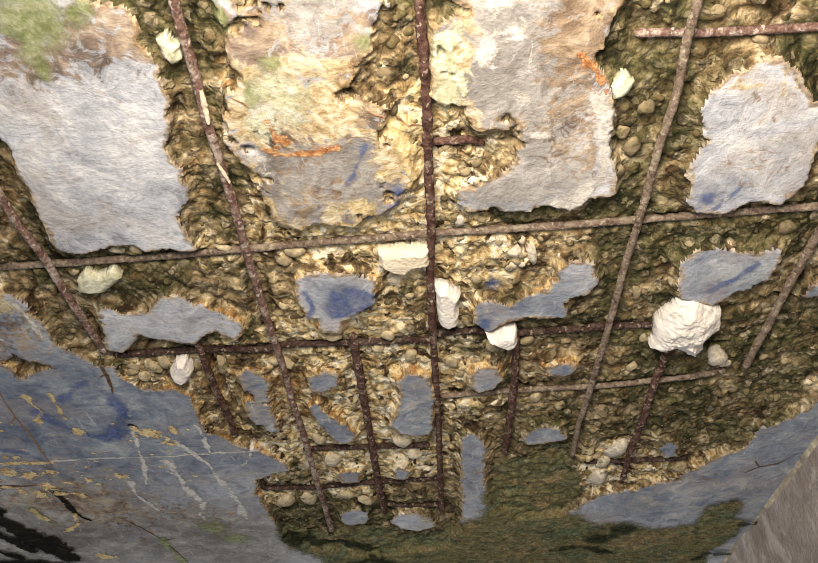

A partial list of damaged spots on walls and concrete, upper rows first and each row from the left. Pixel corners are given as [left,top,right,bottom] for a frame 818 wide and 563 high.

corrosion [576,52,610,95]
corrosion [260,119,341,158]
spalling [0,0,587,537]
spalling [206,0,818,514]
corrosion [0,449,134,504]
leakage [19,380,288,521]
corrosion [126,421,190,452]